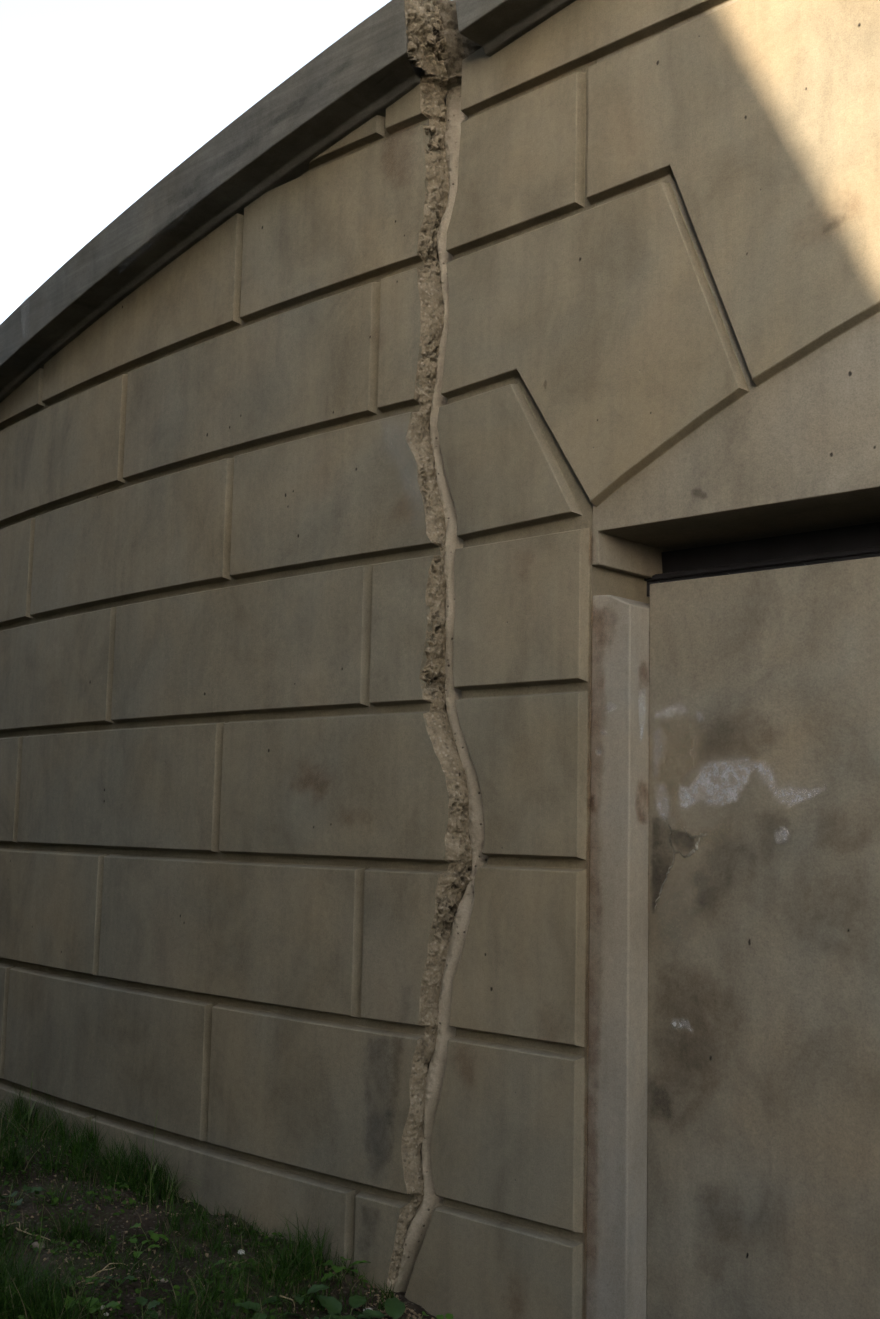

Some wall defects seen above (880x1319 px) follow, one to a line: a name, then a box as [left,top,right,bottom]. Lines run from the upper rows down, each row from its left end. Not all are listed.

crack [386,0,488,1293]
peeling [652,815,709,908]